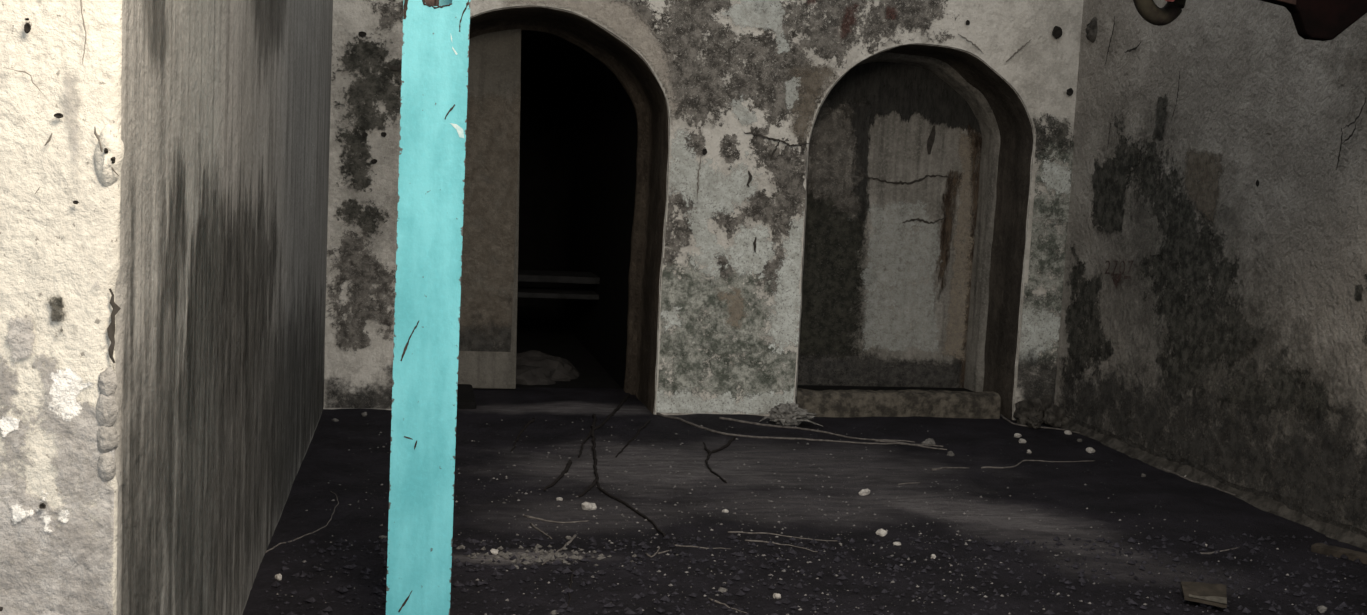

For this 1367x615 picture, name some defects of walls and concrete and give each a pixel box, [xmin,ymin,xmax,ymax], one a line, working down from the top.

peeling [0,316,105,615]
spalling [49,296,66,336]
water stain [33,0,404,615]
water stain [658,99,962,406]
crack [861,173,953,185]
crack [903,215,948,224]
water stain [1017,94,1367,537]